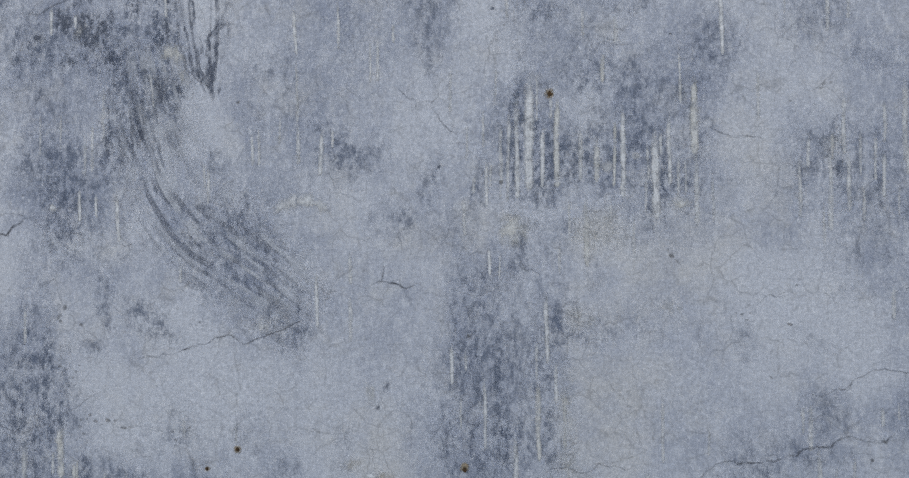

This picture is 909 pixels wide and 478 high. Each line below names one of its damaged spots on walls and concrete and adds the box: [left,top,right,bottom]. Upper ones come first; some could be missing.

leakage [137,1,195,45]
leakage [25,95,109,221]
leakage [118,71,180,150]
leakage [472,80,699,224]
leakage [874,105,887,197]
leakage [10,338,61,420]
leakage [475,344,521,448]
leakage [535,301,566,422]